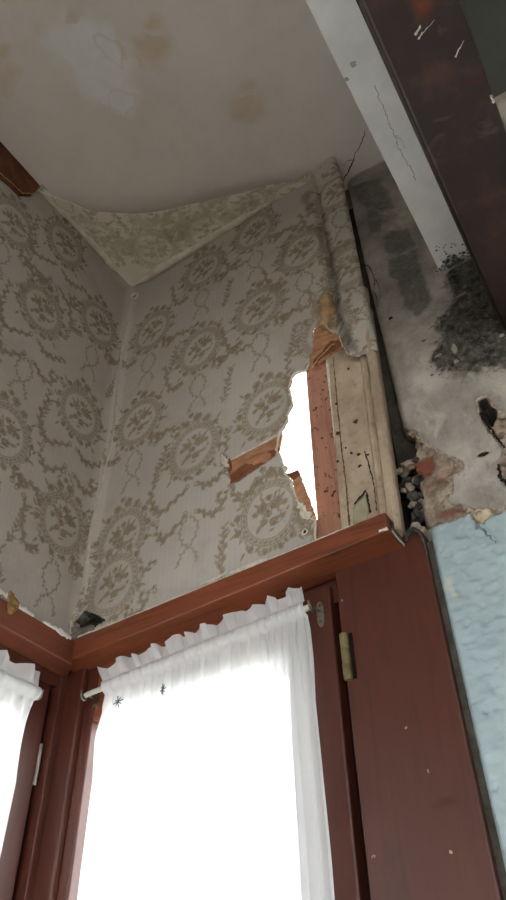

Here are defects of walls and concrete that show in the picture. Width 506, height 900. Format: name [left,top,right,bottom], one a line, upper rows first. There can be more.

leakage [116,9,181,79]
crack [343,87,416,183]
mould [421,239,506,385]
peeling [296,502,313,520]
peeling [324,357,369,525]
spalling [378,430,506,548]
spalling [475,394,506,487]